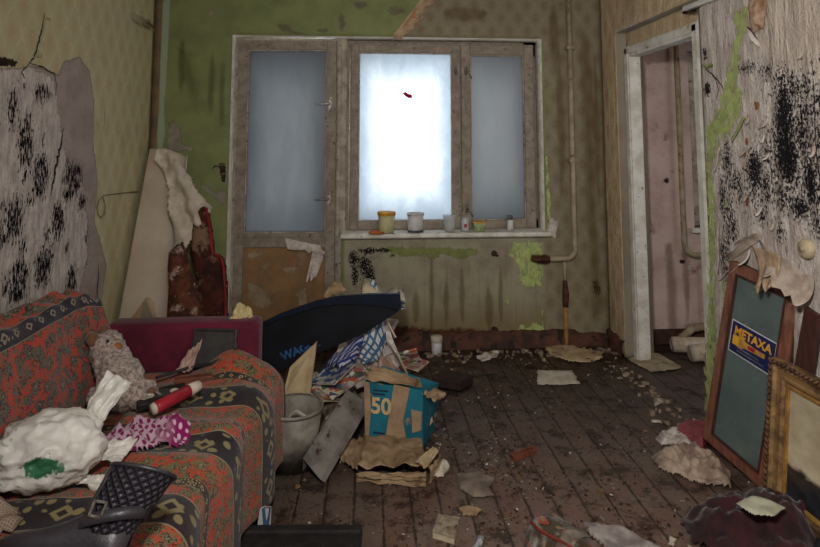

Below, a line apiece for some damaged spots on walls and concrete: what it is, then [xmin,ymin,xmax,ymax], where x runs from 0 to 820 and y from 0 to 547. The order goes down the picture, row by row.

flaking render [0,57,88,314]
leakage [0,83,91,308]
peeling [546,156,558,238]
leakage [718,53,820,290]
leakage [348,247,395,289]
peeling [381,246,478,259]
peeling [491,239,543,287]